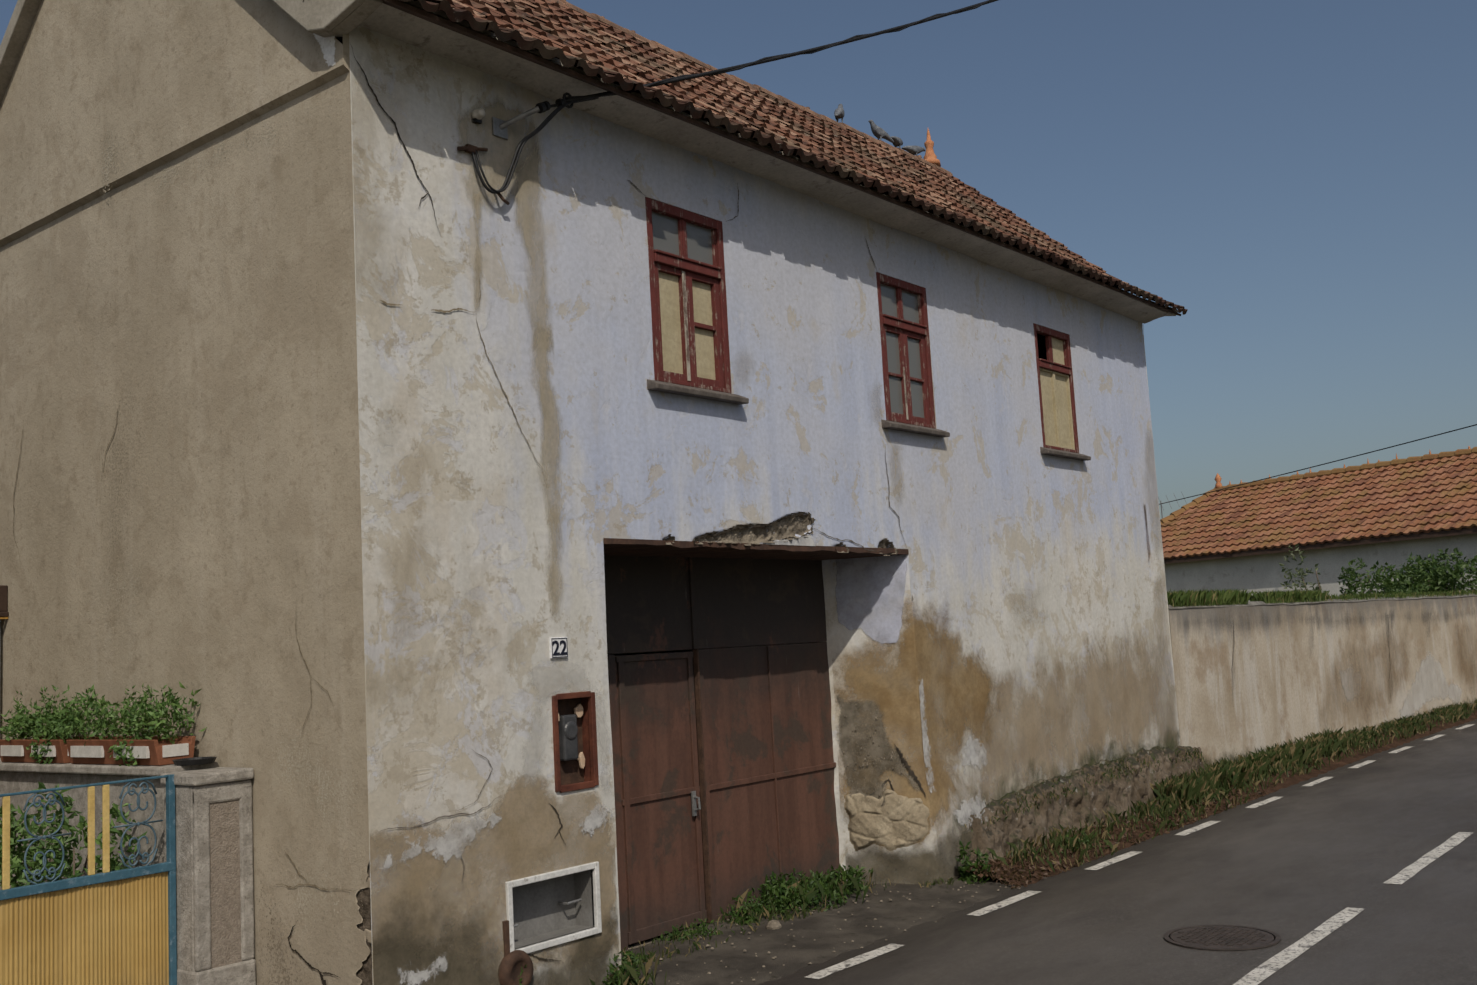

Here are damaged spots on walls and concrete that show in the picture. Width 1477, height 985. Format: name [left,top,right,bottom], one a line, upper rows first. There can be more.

crack [351,46,441,236]
crack [380,280,547,486]
damp [459,100,562,610]
spalling [693,512,816,546]
peeling [835,538,913,643]
flaking render [837,679,934,806]
damp [835,603,1177,885]
crack [379,750,496,882]
flaking render [356,776,619,985]
damp [373,922,500,985]
damp [529,920,617,985]